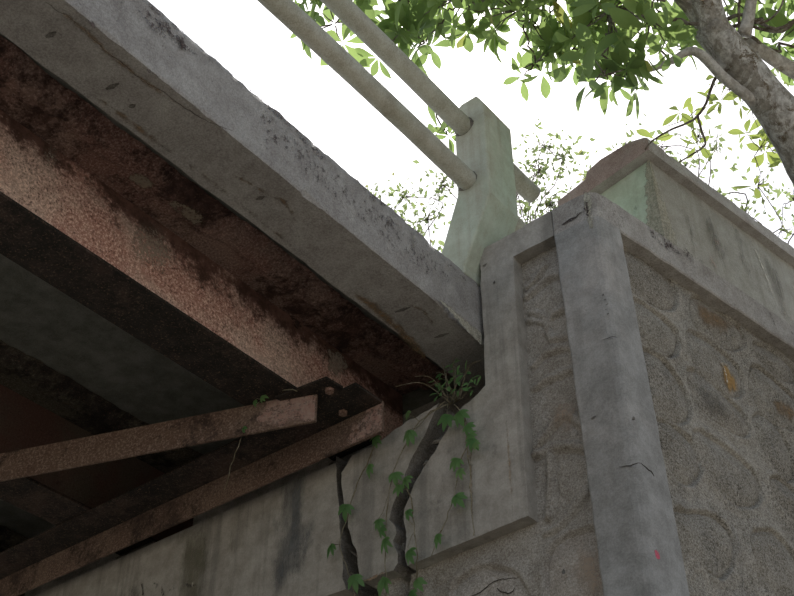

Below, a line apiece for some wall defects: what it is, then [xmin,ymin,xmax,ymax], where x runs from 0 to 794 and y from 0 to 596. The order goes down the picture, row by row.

leakage [276,480,309,585]
crack [351,583,378,596]
crack [472,578,514,596]